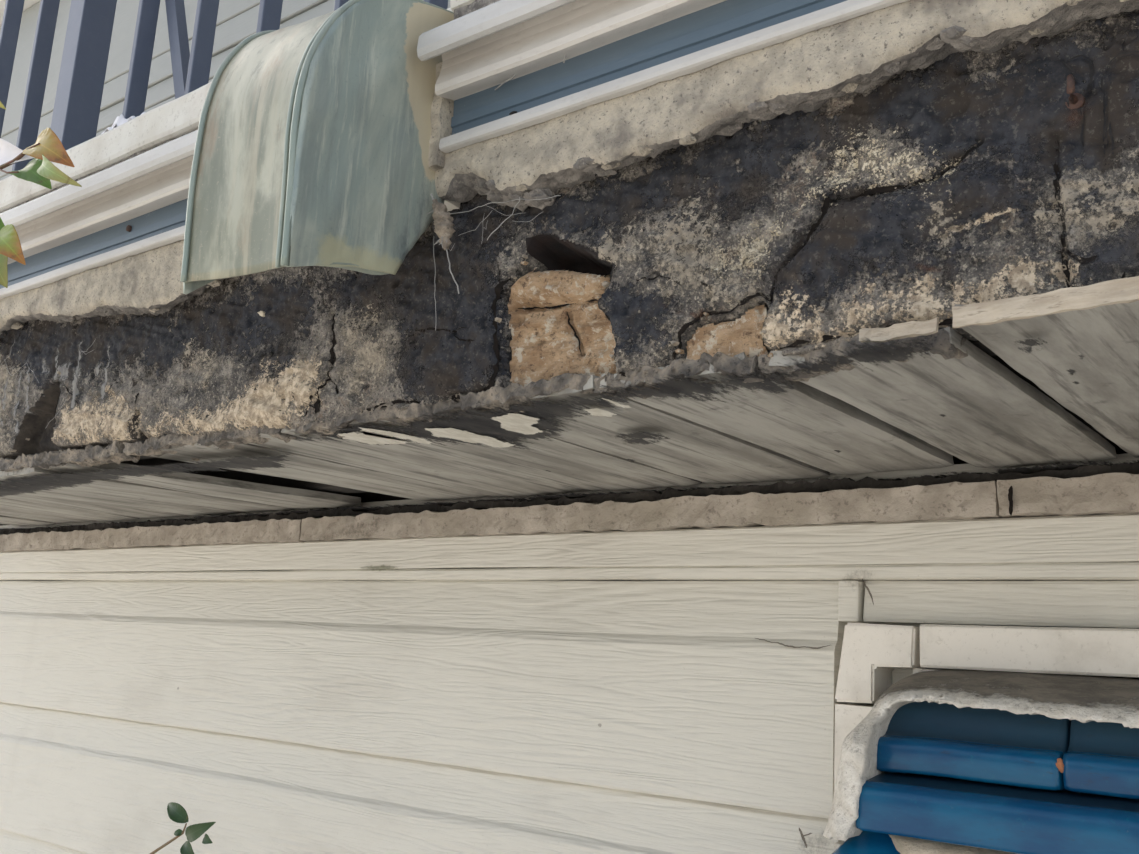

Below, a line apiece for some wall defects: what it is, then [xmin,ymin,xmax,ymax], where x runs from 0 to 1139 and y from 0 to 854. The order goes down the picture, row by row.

crack [249,314,338,420]
spalling [0,233,968,472]
leakage [0,11,1139,454]
spalling [440,0,1139,212]
crack [637,146,977,360]
crack [1053,40,1139,288]